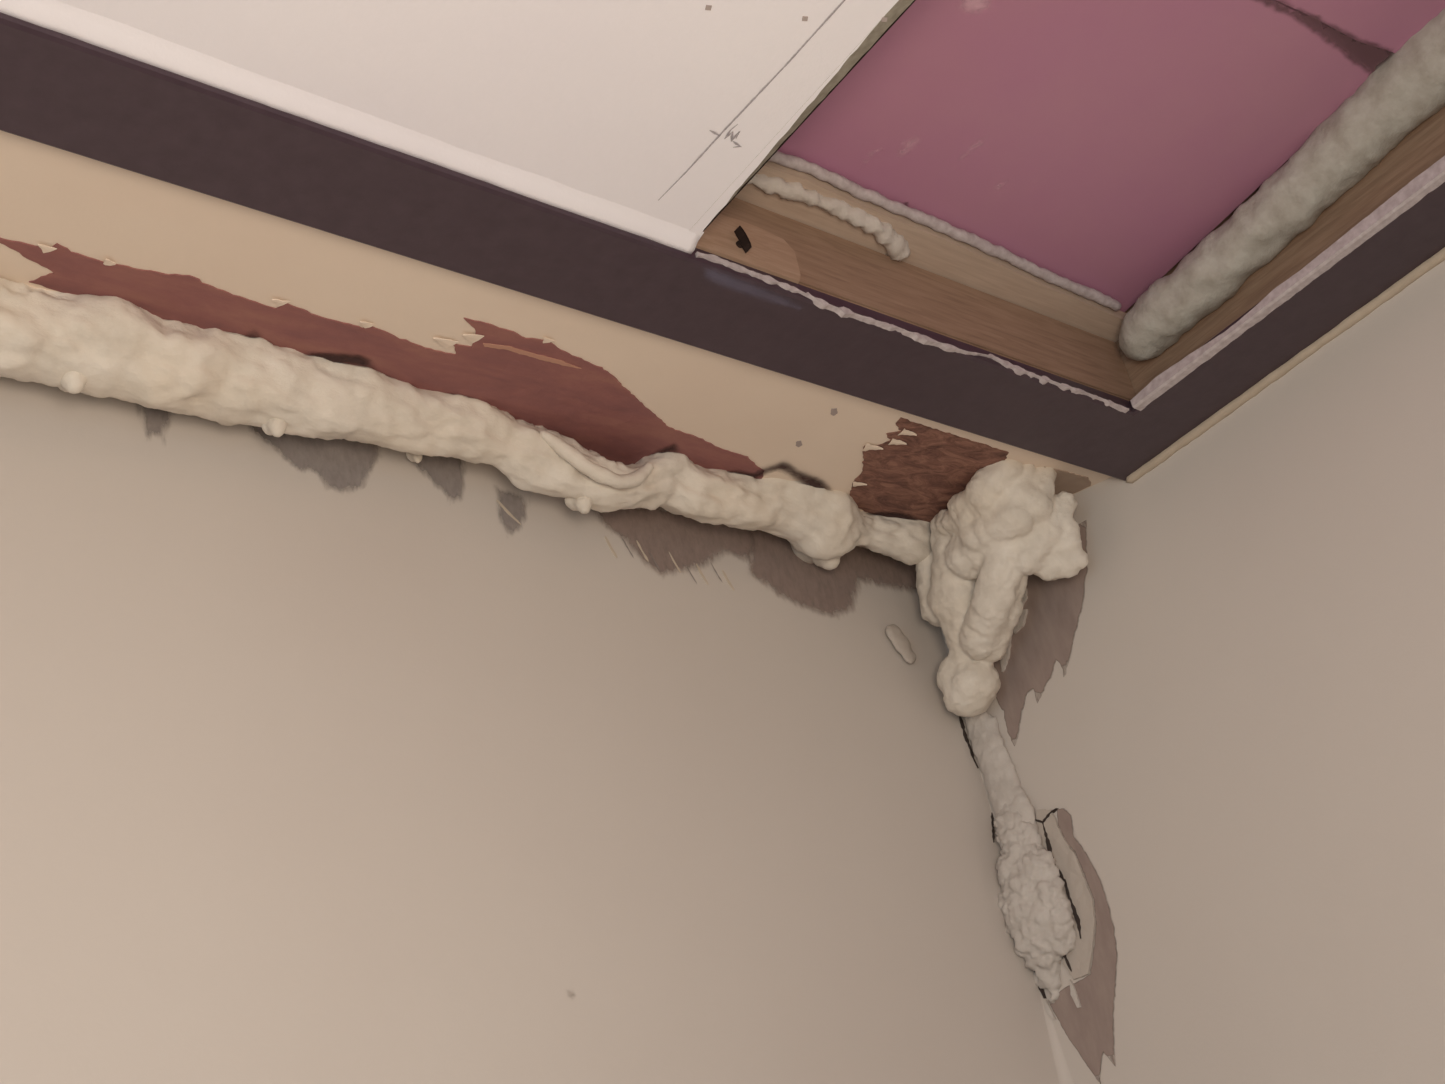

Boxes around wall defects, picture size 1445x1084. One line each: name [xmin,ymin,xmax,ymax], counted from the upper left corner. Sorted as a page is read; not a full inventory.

peeling [0,238,763,479]
peeling [850,417,1009,523]
peeling [994,523,1088,741]
crack [959,716,979,769]
crack [989,813,997,843]
crack [1034,808,1081,999]
peeling [1036,808,1117,1081]